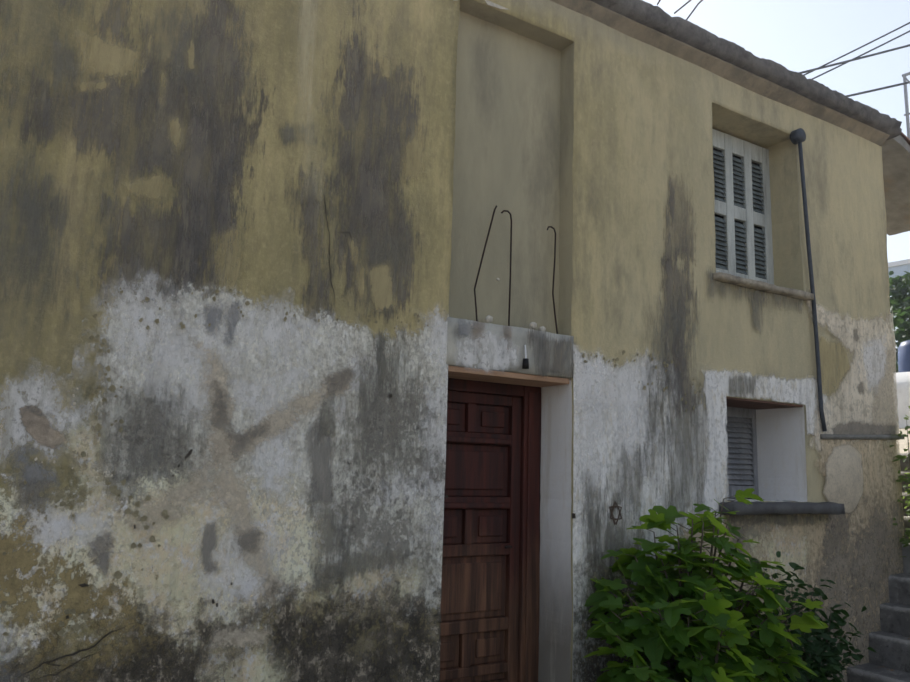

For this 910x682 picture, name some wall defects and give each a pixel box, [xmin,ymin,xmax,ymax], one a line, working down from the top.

water stain [9,0,267,344]
water stain [293,32,422,320]
peeling [0,278,448,682]
water stain [272,597,441,682]
water stain [306,335,445,590]
peeling [458,332,517,370]
water stain [587,487,642,567]
water stain [649,178,704,512]
peeling [572,300,904,682]